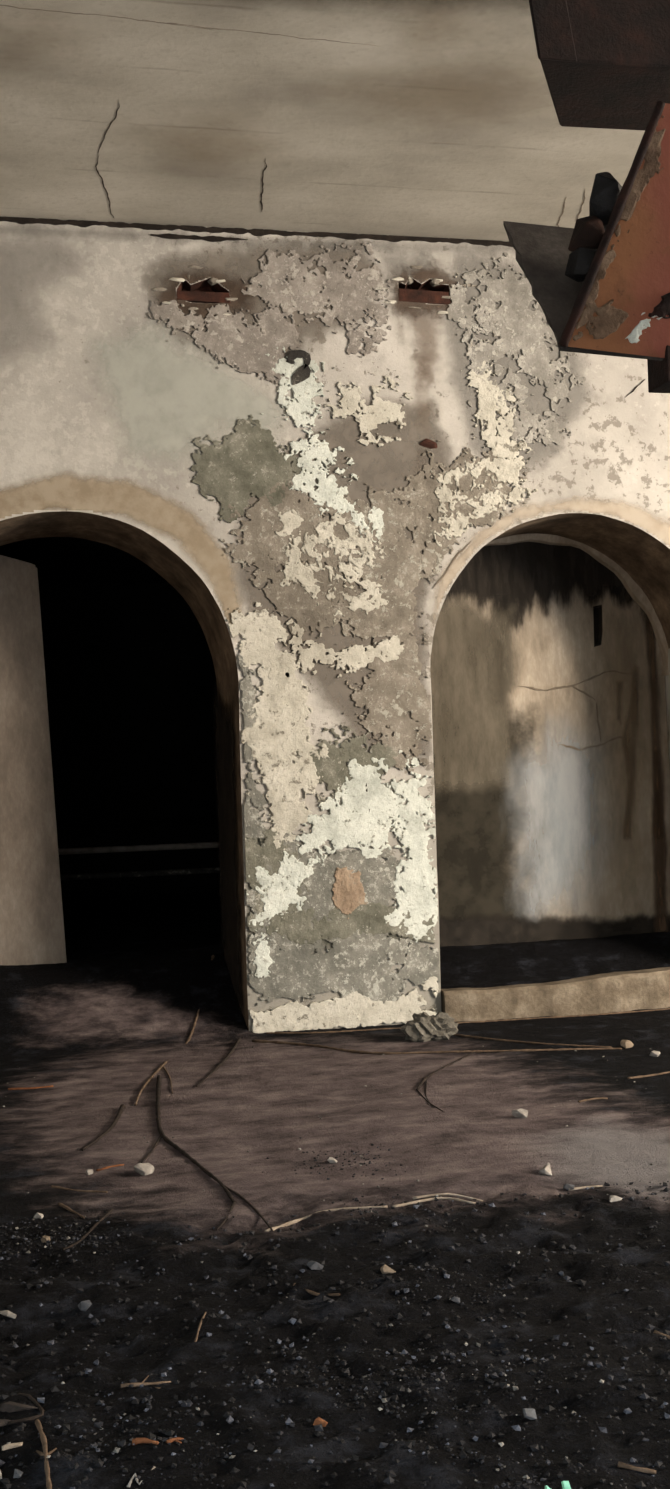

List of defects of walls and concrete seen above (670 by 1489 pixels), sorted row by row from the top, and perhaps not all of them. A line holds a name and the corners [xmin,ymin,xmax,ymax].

crack [0,100,513,247]
crack [557,191,585,227]
rust [573,115,666,341]
rust [648,293,670,319]
damp [286,404,447,521]
damp [0,475,670,922]
flaking render [148,242,586,1033]